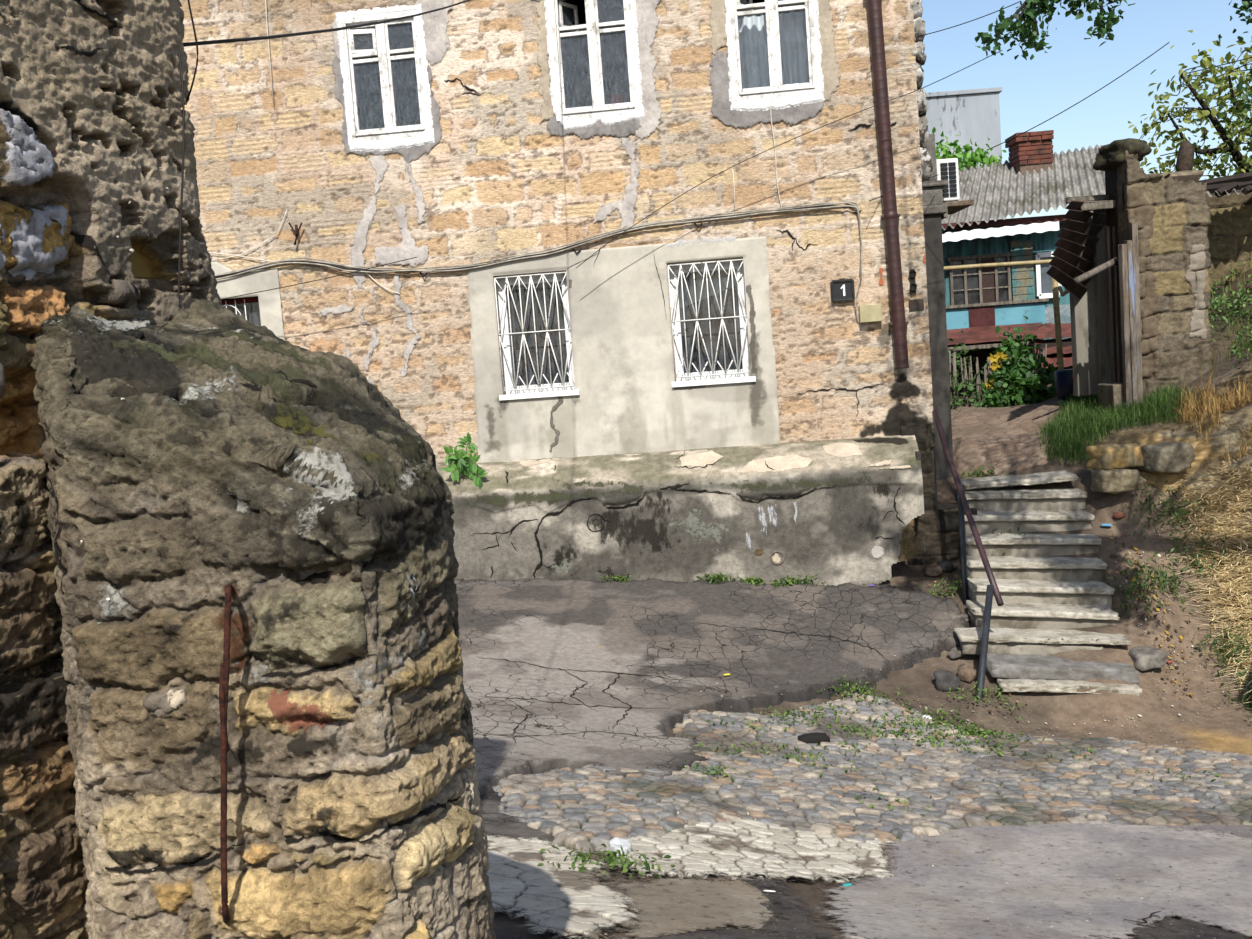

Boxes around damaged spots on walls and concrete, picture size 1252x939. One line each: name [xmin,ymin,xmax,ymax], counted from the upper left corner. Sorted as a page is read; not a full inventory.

peeling [0,108,55,187]
peeling [0,204,68,281]
leakage [487,399,507,447]
crack [536,396,563,471]
leakage [748,341,764,423]
leakage [853,373,935,447]
leakage [544,544,577,573]
crack [470,450,836,581]
leakage [592,491,728,552]
crack [875,487,905,539]
crack [694,622,891,669]
crack [479,657,695,746]